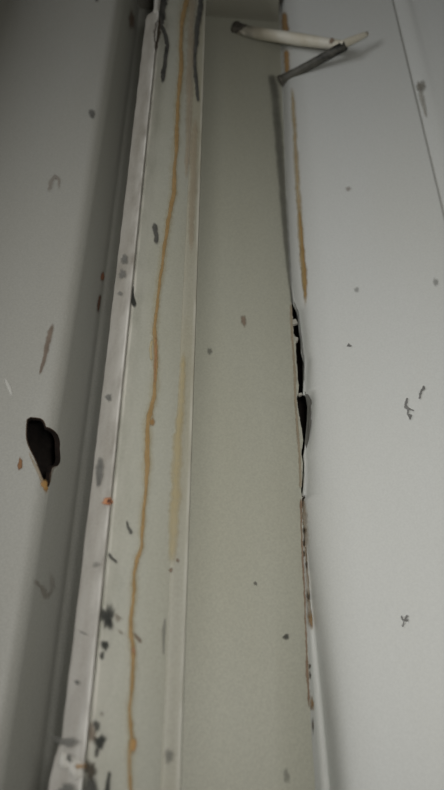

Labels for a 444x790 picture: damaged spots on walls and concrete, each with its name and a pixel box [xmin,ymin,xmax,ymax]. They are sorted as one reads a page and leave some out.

damp [154,0,169,82]
damp [193,0,203,101]
rust [292,97,307,298]
crack [271,77,312,493]
hole [28,420,55,480]
mould [100,608,114,628]
peeling [55,737,85,790]
mould [83,721,111,790]